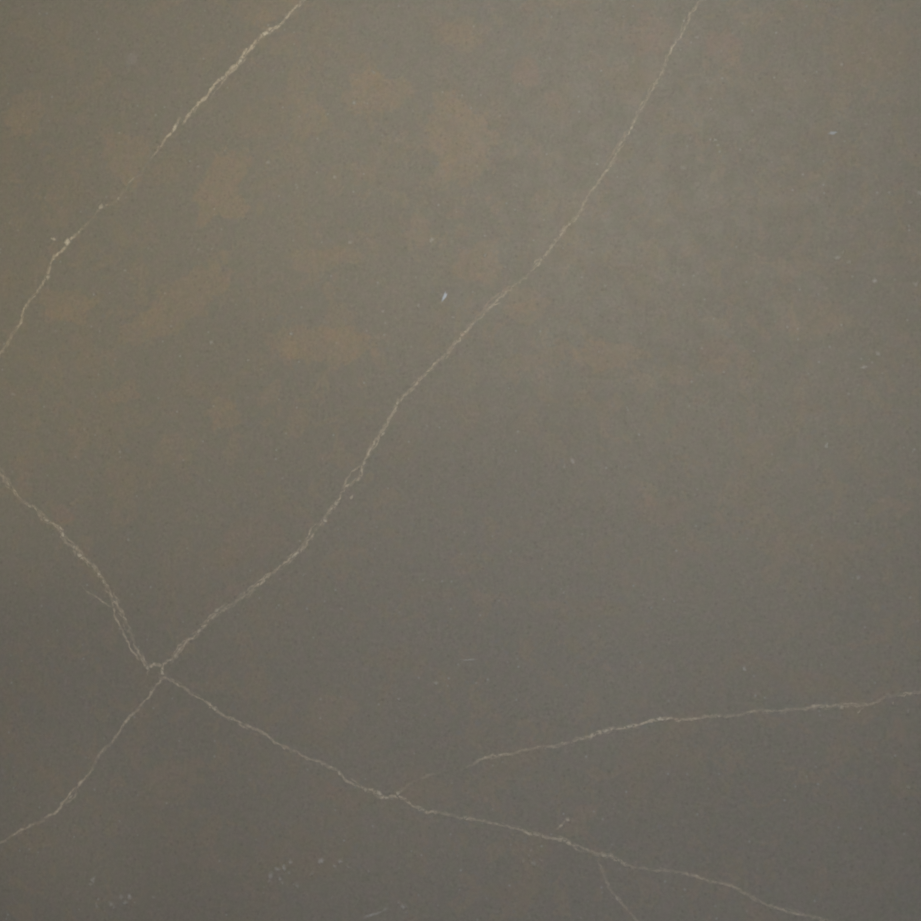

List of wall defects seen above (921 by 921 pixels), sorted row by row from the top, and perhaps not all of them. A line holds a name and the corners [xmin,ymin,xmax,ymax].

crack [0,0,707,677]
crack [0,671,921,921]